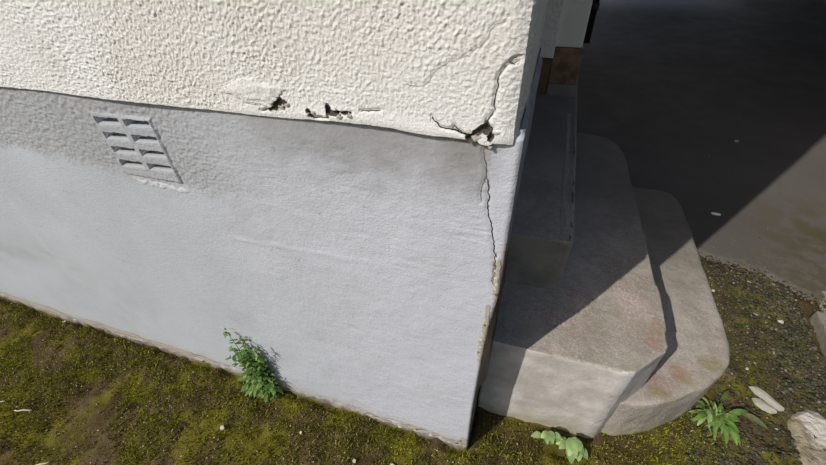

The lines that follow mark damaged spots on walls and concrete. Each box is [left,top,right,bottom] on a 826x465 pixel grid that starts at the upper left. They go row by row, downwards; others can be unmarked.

crack [408,18,506,87]
crack [487,57,518,120]
flaking render [261,97,289,111]
flaking render [304,104,379,119]
crack [432,116,467,135]
flaking render [465,123,499,150]
crack [480,146,497,286]